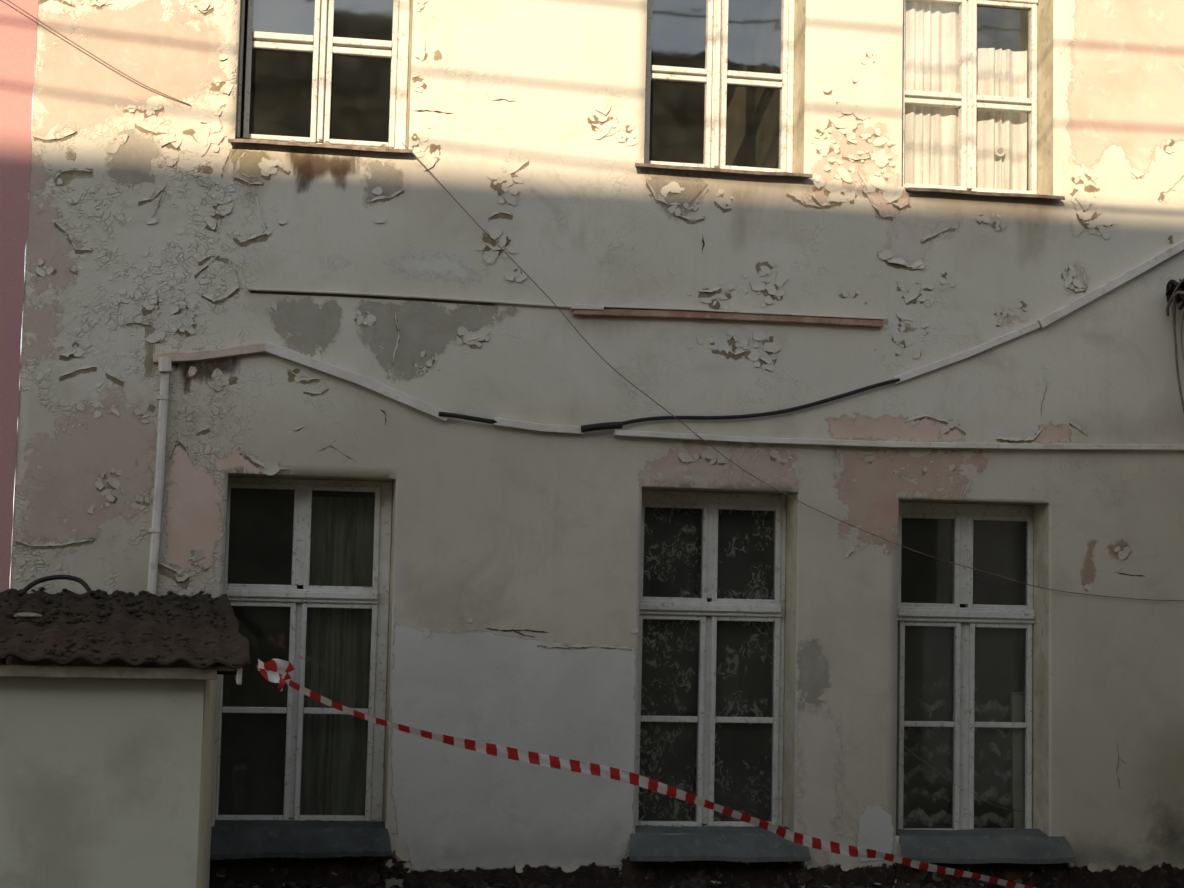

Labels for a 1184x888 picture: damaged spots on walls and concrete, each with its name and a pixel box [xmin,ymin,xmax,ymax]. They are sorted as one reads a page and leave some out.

peeling [21,0,290,391]
peeling [364,161,404,223]
peeling [412,124,441,171]
peeling [476,159,529,283]
peeling [786,83,958,360]
peeling [1057,0,1184,239]
peeling [270,297,517,380]
peeling [688,327,780,371]
peeling [686,259,789,310]
peeling [158,439,290,589]
peeling [639,441,799,488]
peeling [826,413,987,557]